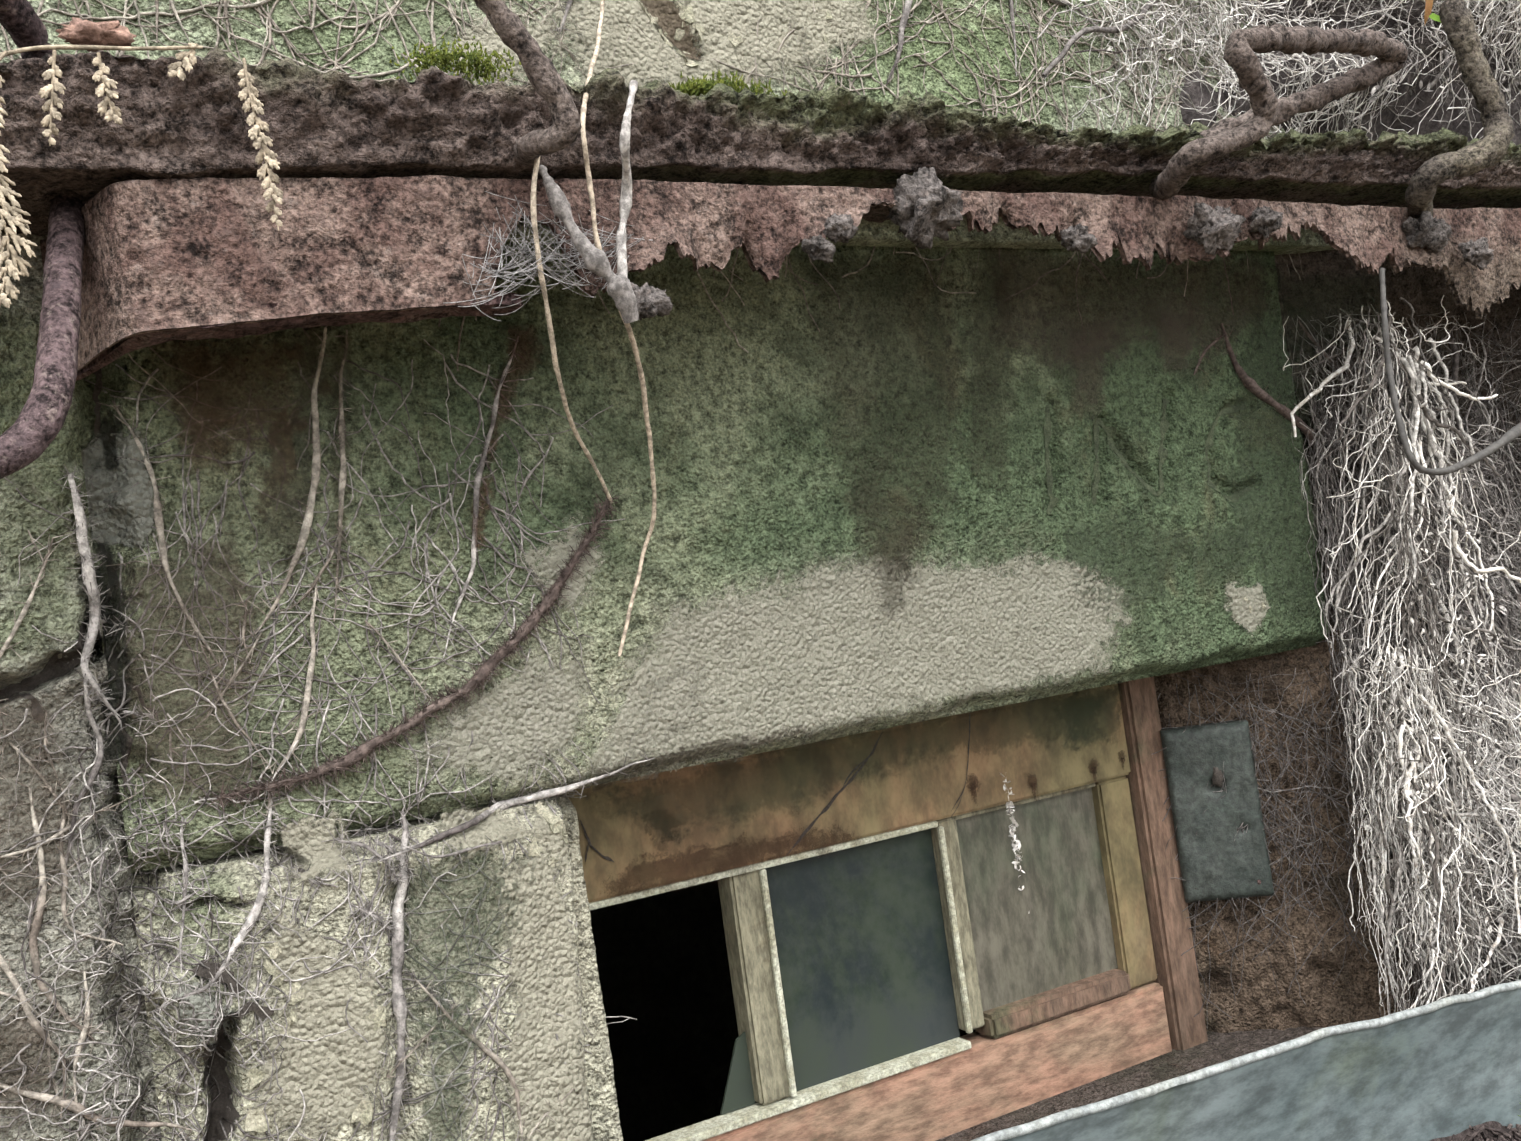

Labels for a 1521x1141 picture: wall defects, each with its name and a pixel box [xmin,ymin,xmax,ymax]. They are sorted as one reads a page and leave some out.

corrosion [1183,202,1283,256]
peeling [1224,582,1270,632]